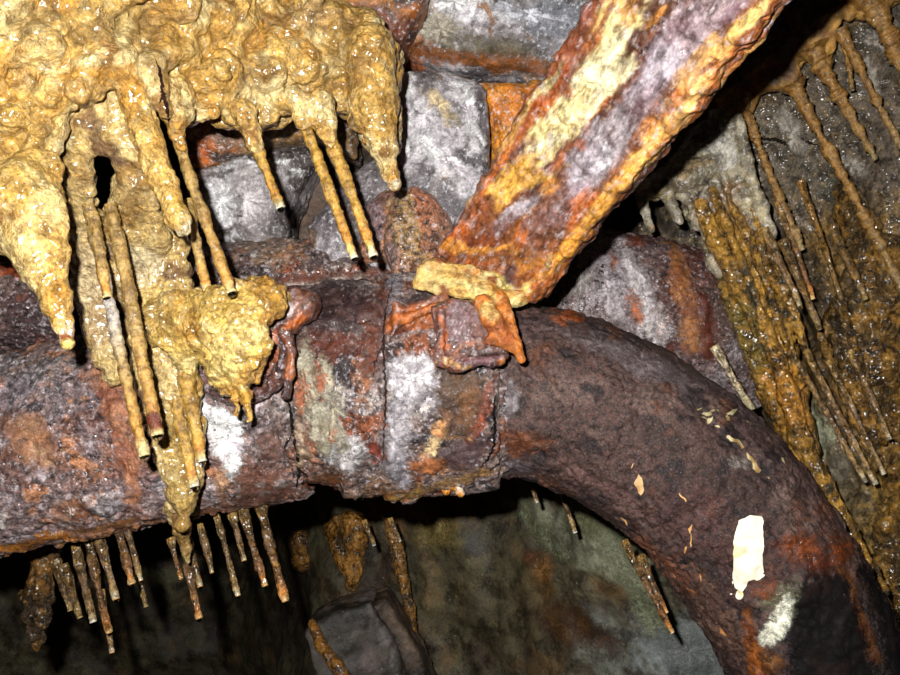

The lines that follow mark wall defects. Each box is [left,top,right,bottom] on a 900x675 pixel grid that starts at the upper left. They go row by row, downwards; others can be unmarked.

damp [205,156,303,229]
damp [773,108,810,155]
damp [839,154,869,177]
corrosion [277,269,388,390]
corrosion [656,245,716,361]
corrosion [0,368,144,552]
damp [201,394,246,482]
corrosion [294,367,328,413]
damp [294,339,361,474]
damp [382,350,491,490]
peeling [730,515,765,600]
corrosion [741,610,783,675]